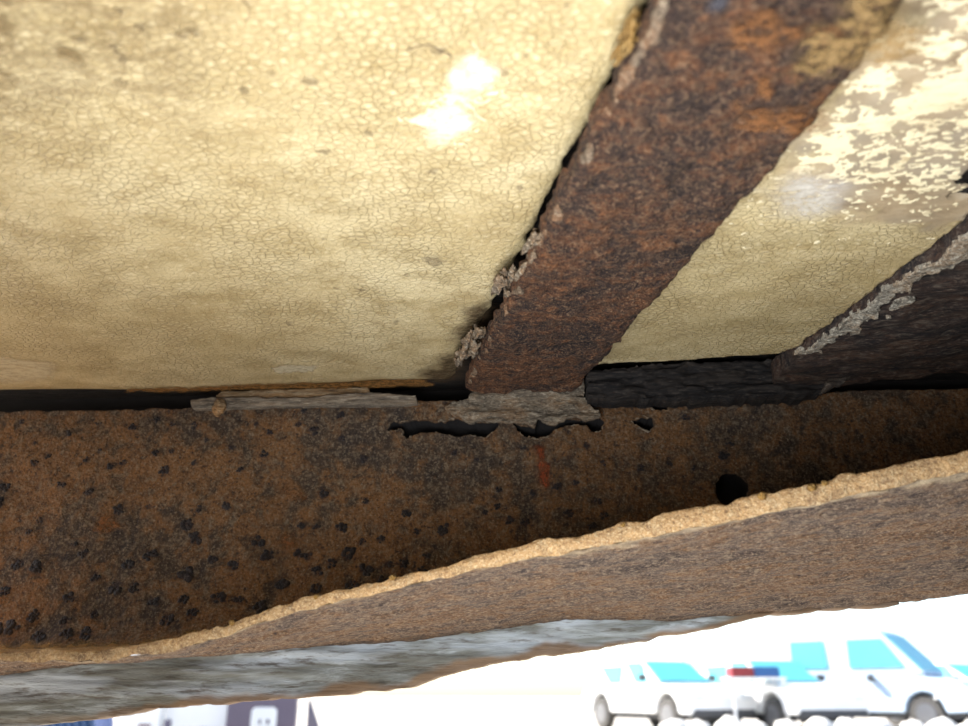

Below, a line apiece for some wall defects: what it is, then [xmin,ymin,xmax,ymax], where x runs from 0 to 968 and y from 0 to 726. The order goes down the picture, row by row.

corrosion [730,0,926,76]
peeling [397,55,513,149]
corrosion [737,106,822,135]
peeling [770,0,968,225]
spalling [388,418,499,438]
spalling [512,418,604,450]
spalling [633,406,670,433]